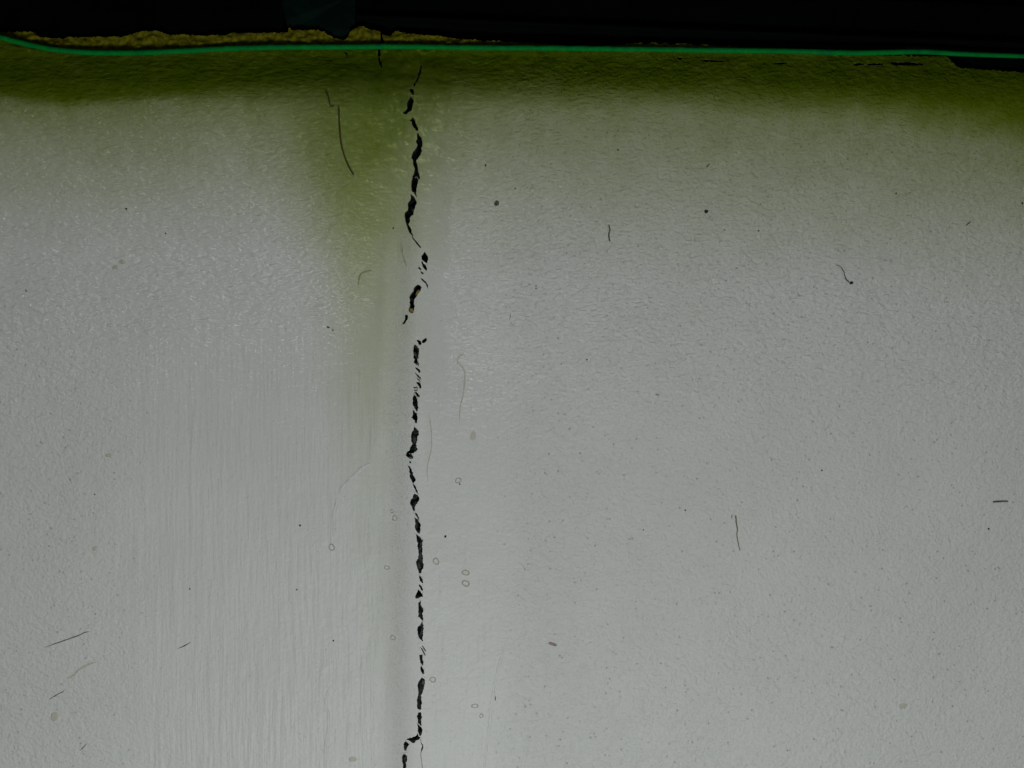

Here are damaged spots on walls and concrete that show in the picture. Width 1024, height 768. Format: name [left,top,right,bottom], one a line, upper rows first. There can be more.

crack [402,65,428,768]
water stain [0,40,1024,134]